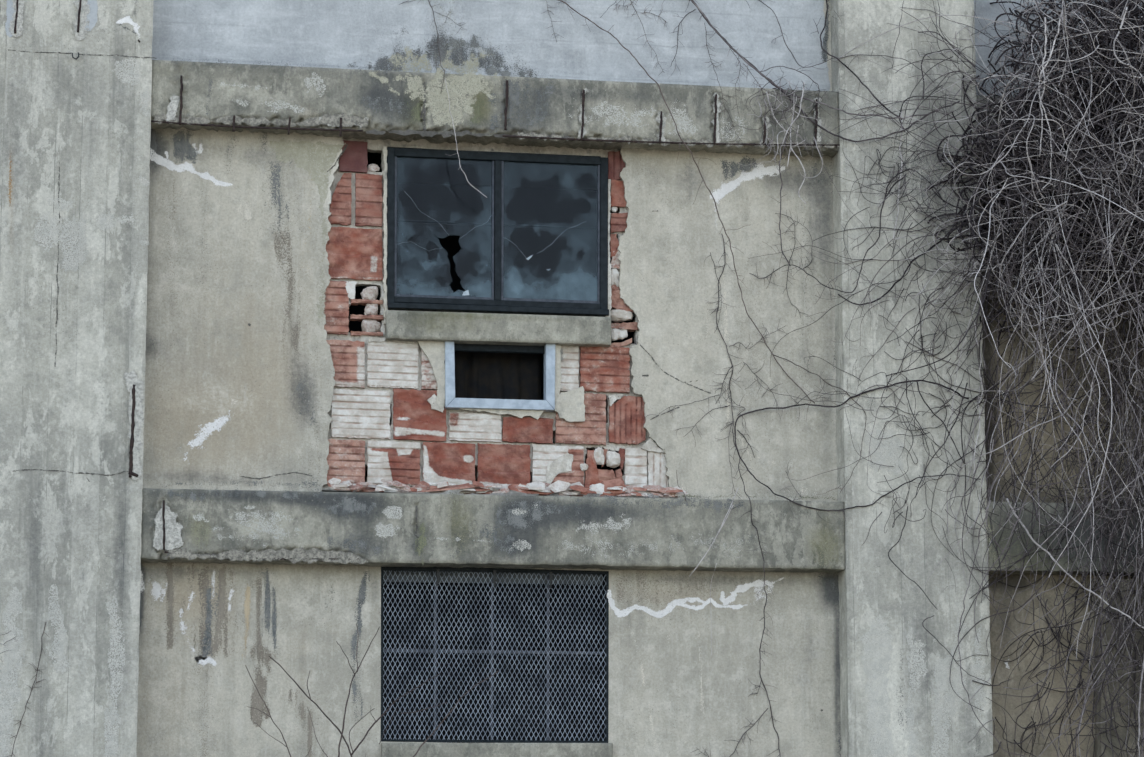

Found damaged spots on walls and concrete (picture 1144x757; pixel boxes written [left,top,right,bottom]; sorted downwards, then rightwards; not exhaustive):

water stain [317,0,558,133]
crack [53,162,61,367]
spalling [112,57,851,423]
water stain [150,129,387,561]
crack [14,469,129,482]
spalling [153,500,369,565]
peeling [375,506,403,538]
flaking render [512,452,573,515]
spalling [589,483,611,494]
water stain [479,488,749,559]
water stain [139,562,323,757]
water stain [350,571,371,722]